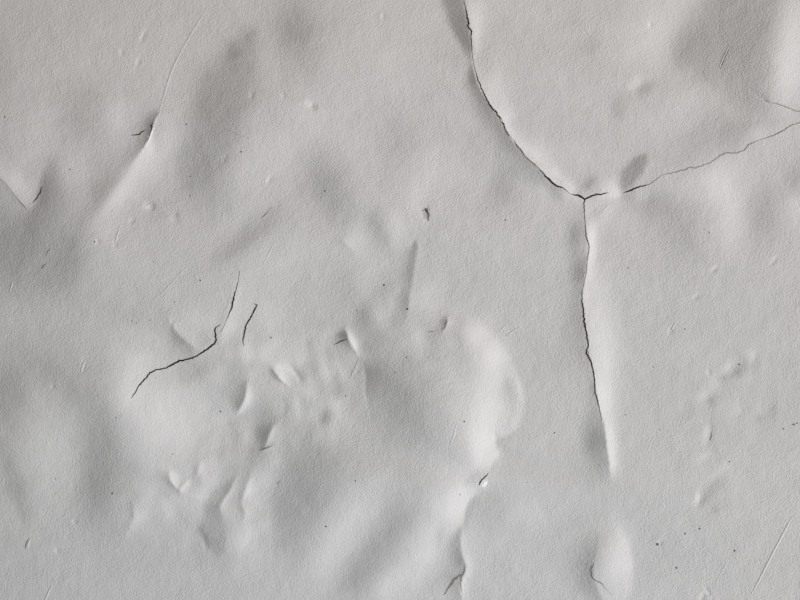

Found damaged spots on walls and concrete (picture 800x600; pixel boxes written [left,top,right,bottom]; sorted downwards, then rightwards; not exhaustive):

crack [464,2,800,418]
crack [132,271,240,397]
crack [243,304,258,345]